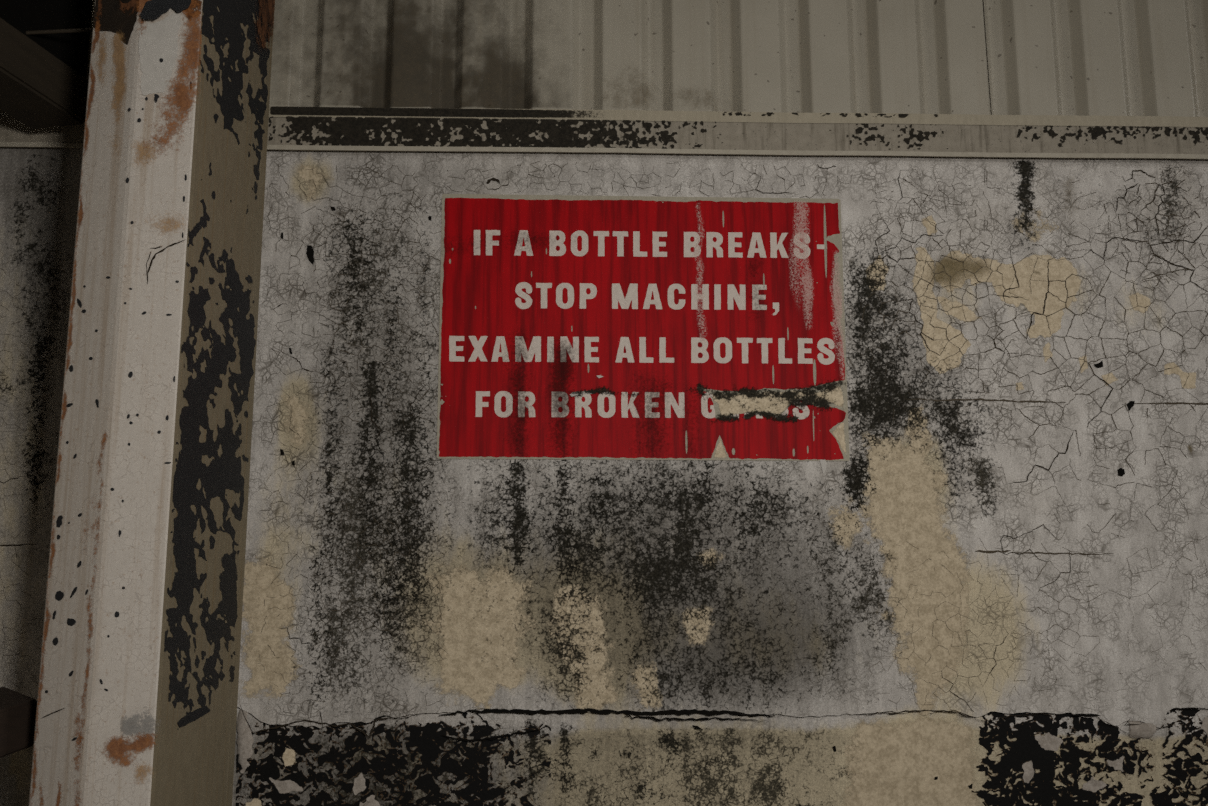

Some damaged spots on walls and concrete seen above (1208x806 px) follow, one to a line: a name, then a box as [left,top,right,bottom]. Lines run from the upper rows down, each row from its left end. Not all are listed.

rust [84,0,125,153]
rust [138,0,202,158]
peeling [93,0,273,214]
leakage [1010,160,1037,253]
peeling [912,209,1081,374]
peeling [157,191,302,727]
leakage [300,210,453,704]
crack [240,161,1208,742]
leakage [466,247,997,712]
peeling [269,748,303,794]
leakage [303,718,849,806]
peeling [1035,732,1063,751]